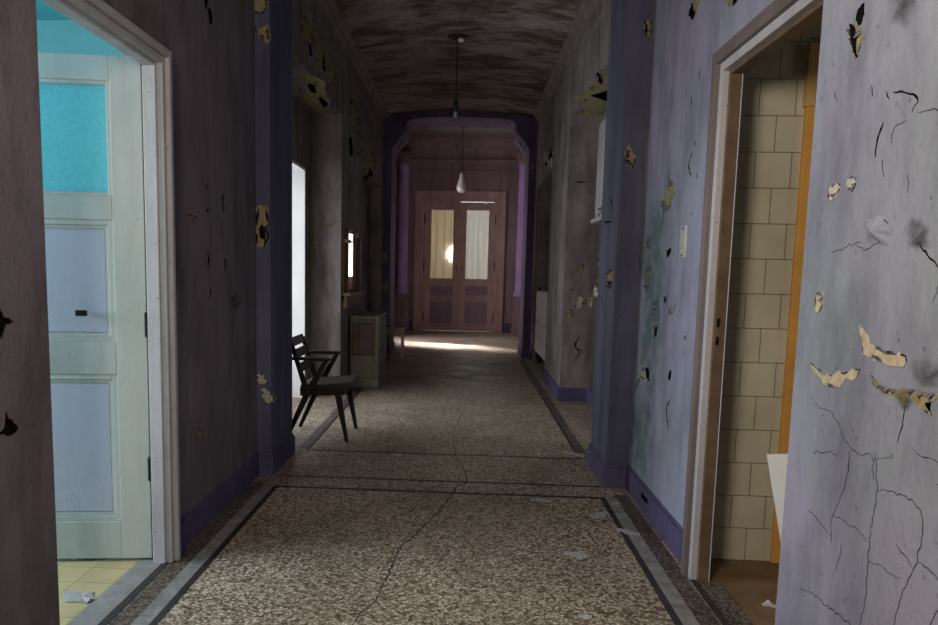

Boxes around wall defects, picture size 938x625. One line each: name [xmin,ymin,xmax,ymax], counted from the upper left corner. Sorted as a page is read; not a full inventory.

peeling [688,0,700,20]
spalling [846,3,865,59]
peeling [574,72,608,116]
crack [871,86,938,177]
peeling [566,258,613,319]
crack [920,244,938,301]
peeling [859,324,907,367]
peeling [811,363,860,388]
peeling [870,375,937,443]
crack [352,415,468,625]
crack [800,405,938,625]